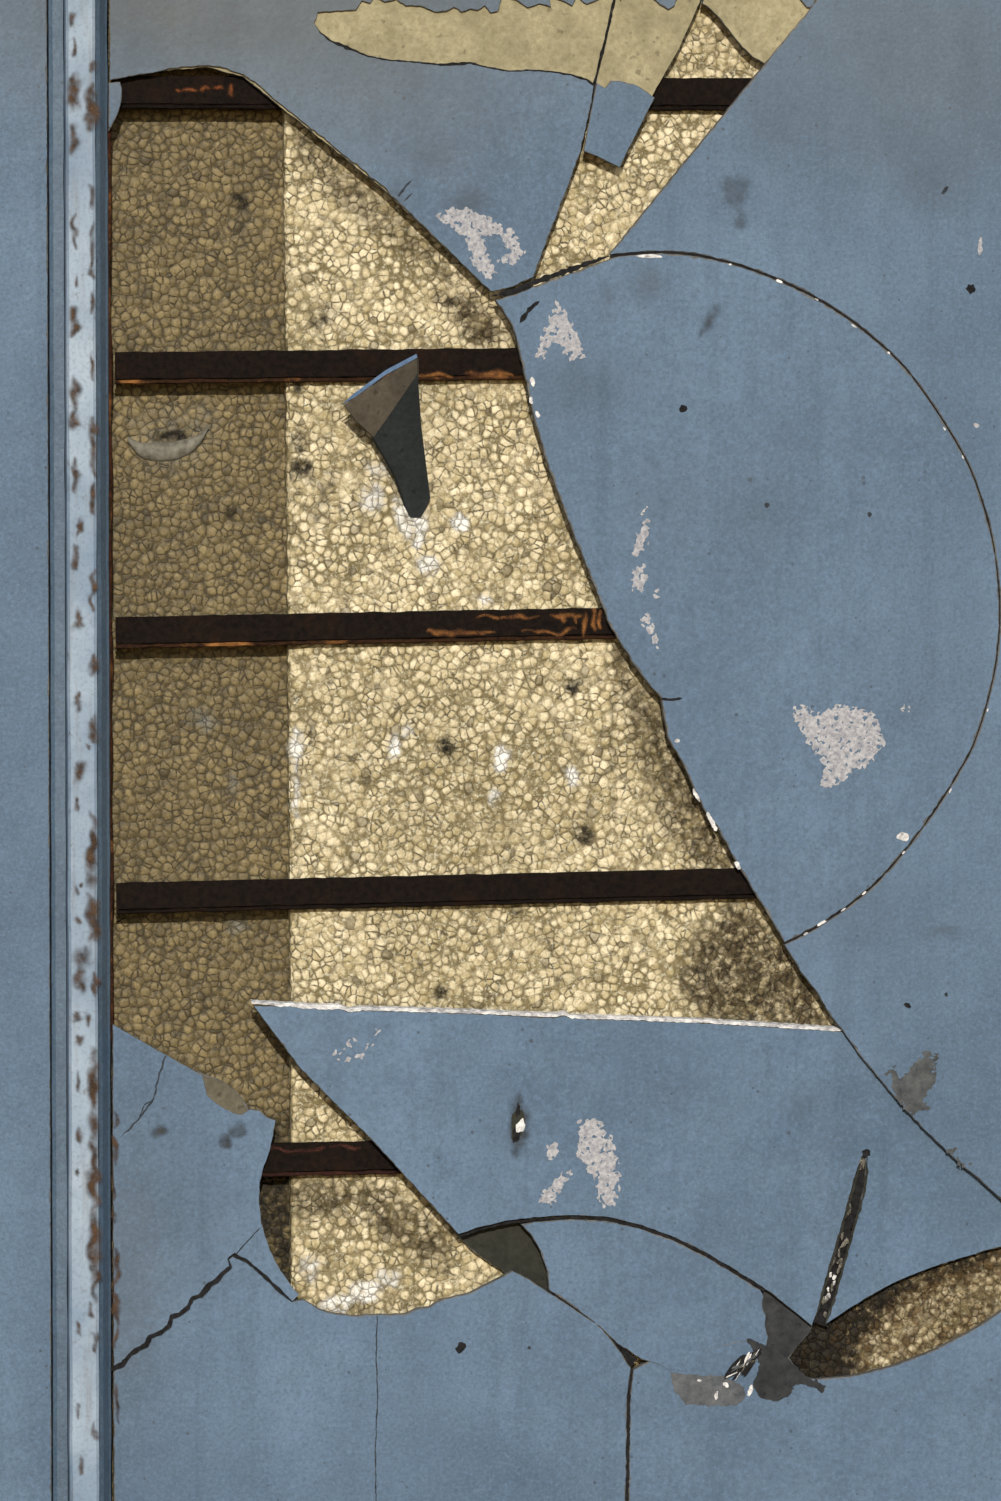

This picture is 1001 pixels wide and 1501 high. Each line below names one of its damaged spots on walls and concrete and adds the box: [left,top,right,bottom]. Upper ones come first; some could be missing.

corrosion [68,61,100,152]
peeling [314,0,816,107]
corrosion [69,358,97,626]
crack [490,251,1000,944]
peeling [793,704,886,788]
corrosion [74,818,101,993]
corrosion [76,1065,120,1351]
peeling [539,1118,622,1209]
crack [110,1227,292,1371]
crack [372,1316,380,1501]
crack [547,1289,637,1501]
peeling [671,1268,826,1407]